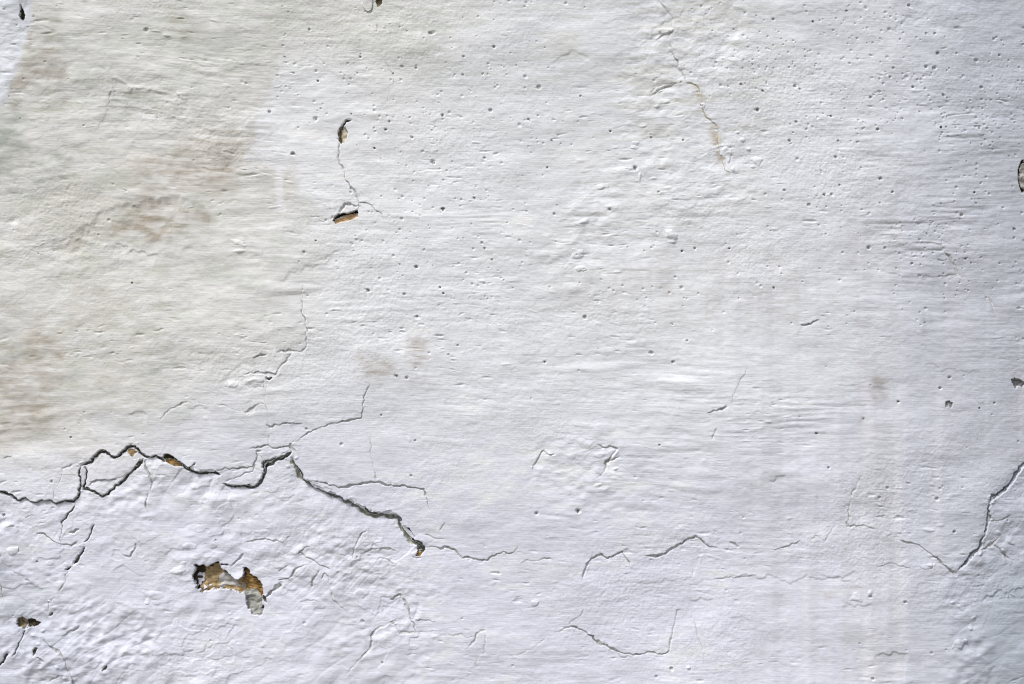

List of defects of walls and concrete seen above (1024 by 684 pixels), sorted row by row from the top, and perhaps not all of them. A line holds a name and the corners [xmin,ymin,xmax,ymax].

flaking render [338,126,348,144]
flaking render [333,210,358,224]
crack [0,285,552,684]
crack [876,462,1024,575]
crack [582,536,739,579]
flaking render [193,561,265,615]
flaking render [17,616,41,629]
crack [349,594,704,672]